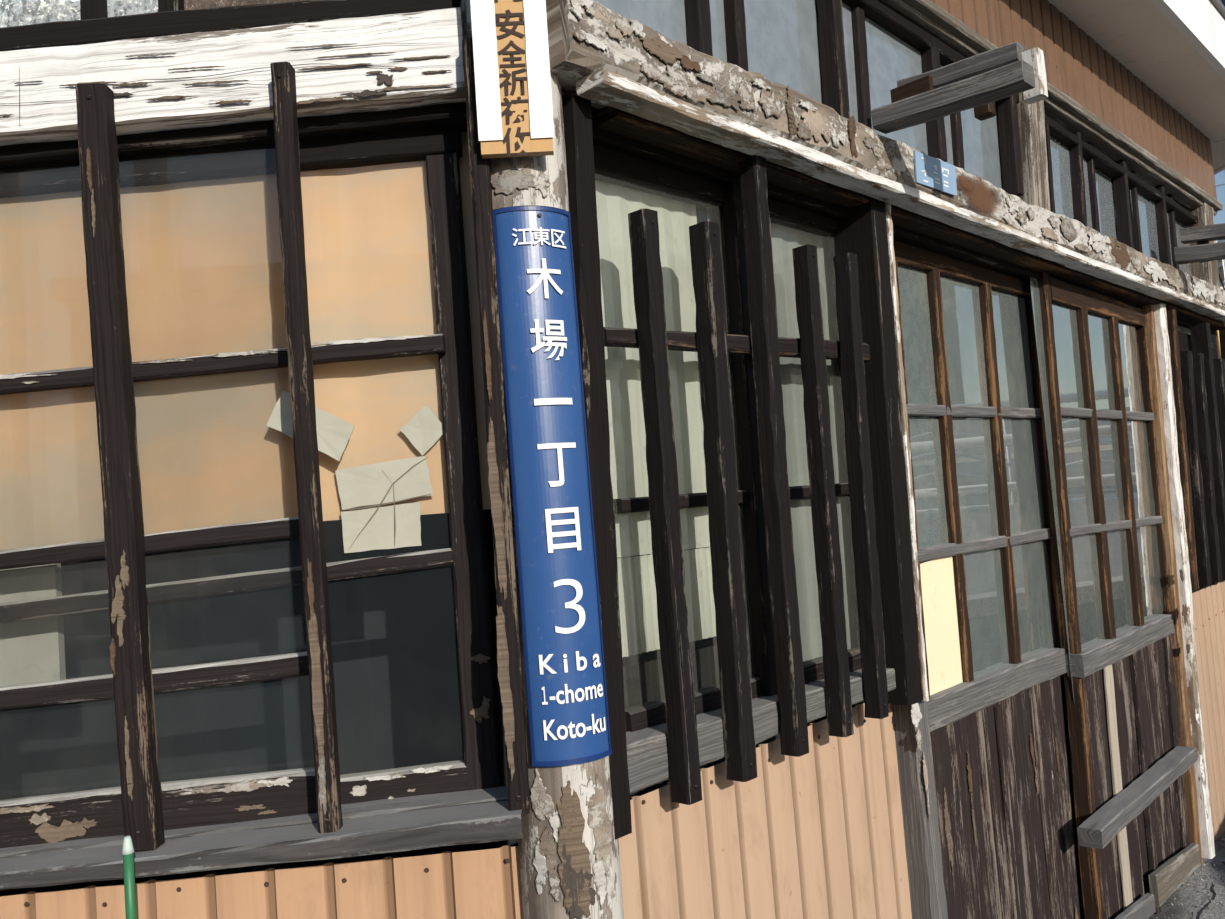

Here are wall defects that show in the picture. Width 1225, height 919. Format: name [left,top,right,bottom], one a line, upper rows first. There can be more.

peeling [60,53,249,101]
peeling [285,43,454,105]
peeling [571,0,906,177]
peeling [483,311,492,403]
peeling [109,549,130,675]
peeling [469,418,515,781]
peeling [0,803,97,843]
peeling [179,777,293,815]
peeling [530,768,616,919]